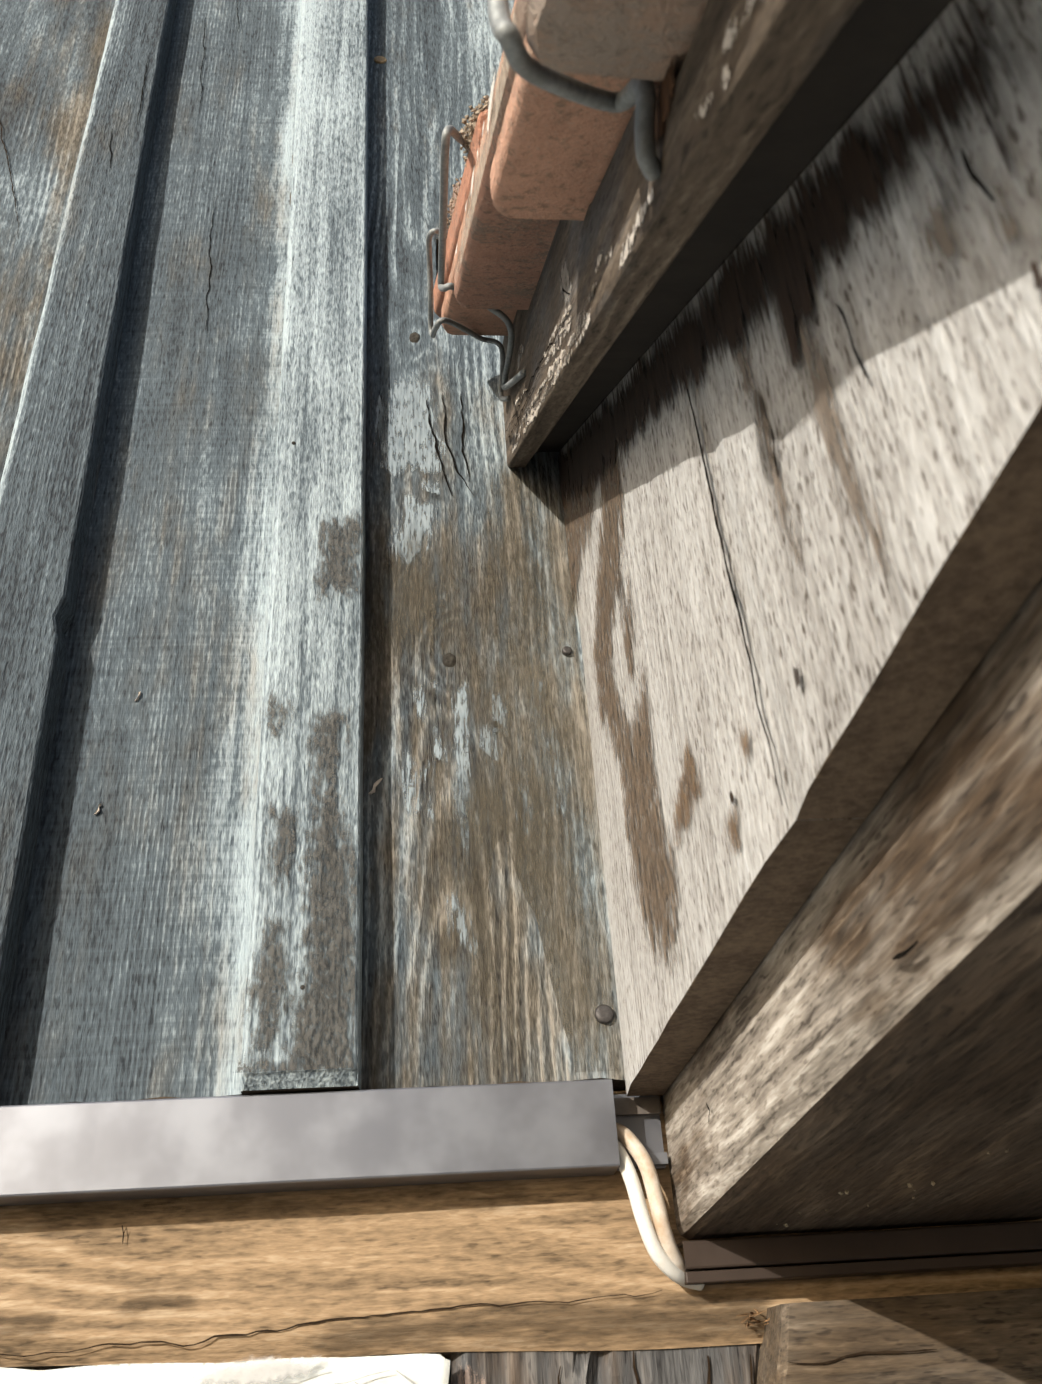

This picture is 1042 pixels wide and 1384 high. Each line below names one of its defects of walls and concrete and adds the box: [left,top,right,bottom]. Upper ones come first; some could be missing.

peeling [695,0,755,118]
crack [0,123,19,239]
crack [426,393,473,495]
crack [504,273,574,444]
peeling [512,188,653,453]
leakage [448,0,1018,1063]
crack [683,376,783,806]